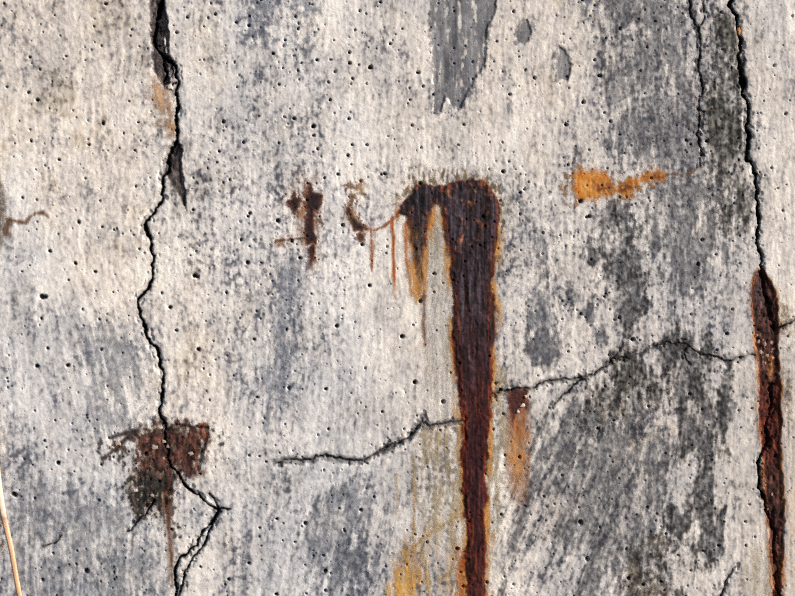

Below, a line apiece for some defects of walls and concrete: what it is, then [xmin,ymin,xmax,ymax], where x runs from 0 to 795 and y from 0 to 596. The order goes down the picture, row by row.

rust [0,196,48,239]
rust [97,416,224,586]
crack [137,0,229,596]
rust [276,182,324,267]
crack [275,414,464,464]
rust [344,167,530,596]
crack [493,341,755,405]
rust [562,165,700,206]
crack [688,0,705,155]
crack [727,0,762,269]
crack [756,446,766,512]
rust [751,267,787,596]